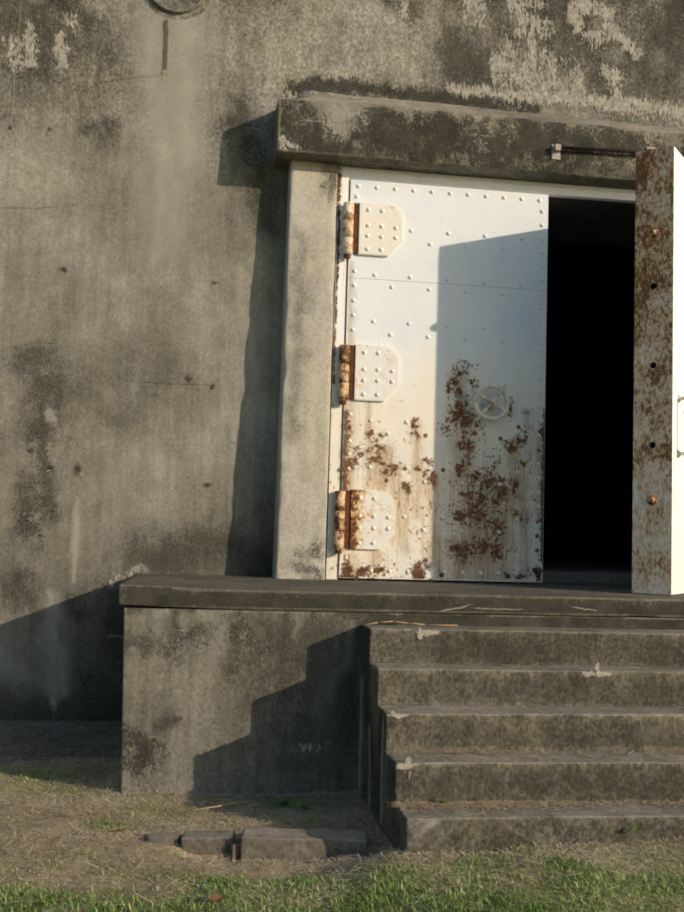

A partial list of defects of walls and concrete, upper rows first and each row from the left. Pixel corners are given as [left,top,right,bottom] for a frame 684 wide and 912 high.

leakage [0,0,124,95]
leakage [280,0,684,198]
leakage [13,343,72,538]
leakage [0,499,684,819]